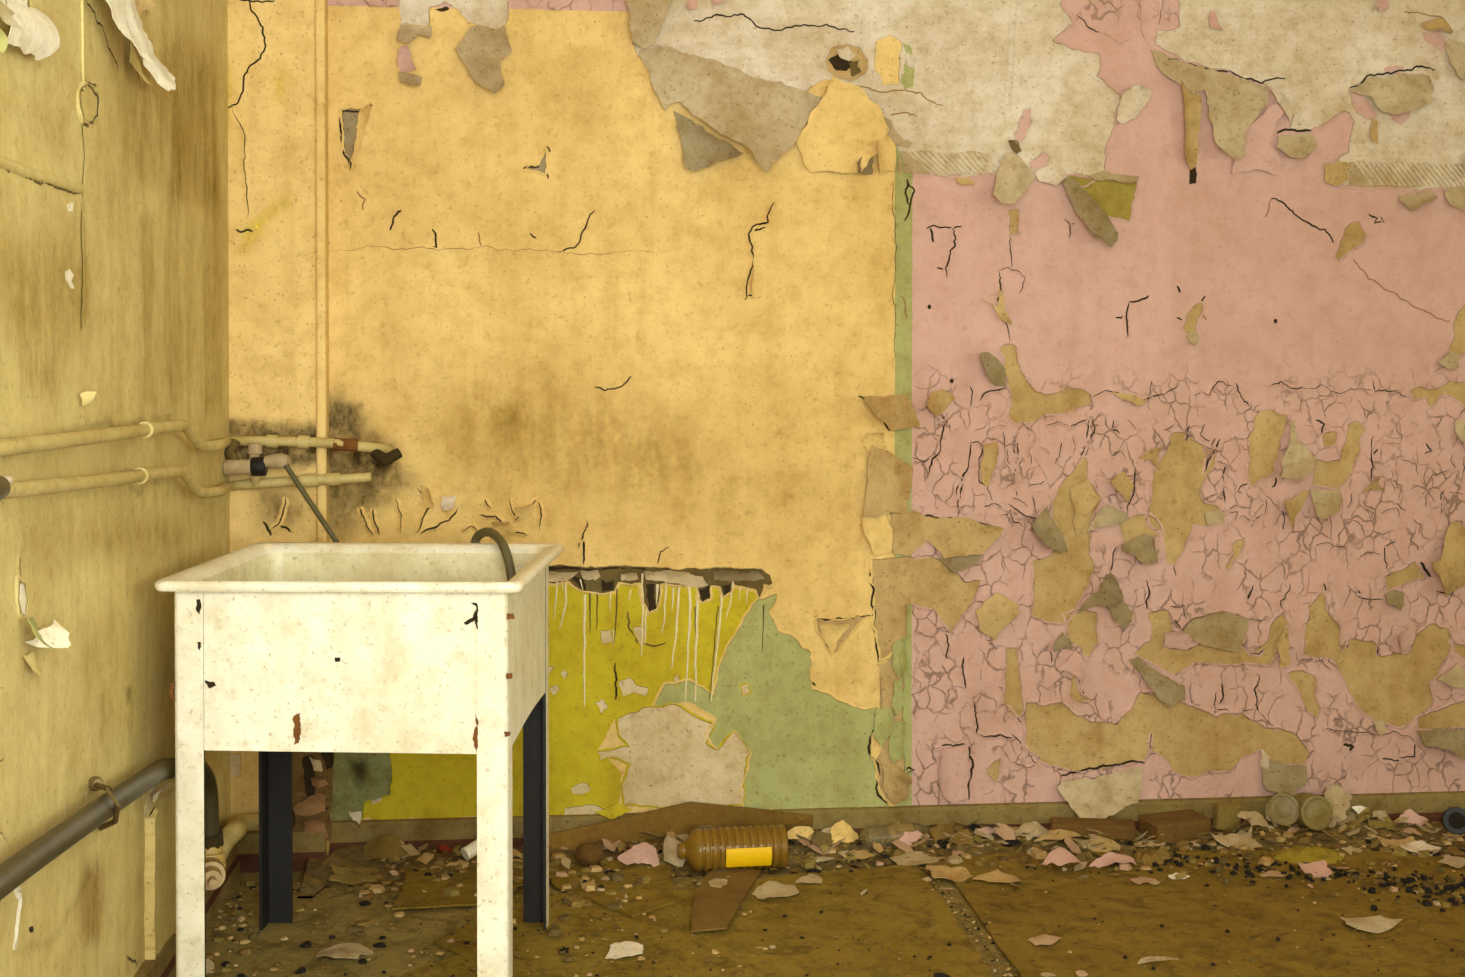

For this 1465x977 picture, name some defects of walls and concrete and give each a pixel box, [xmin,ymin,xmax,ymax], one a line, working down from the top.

peeling [0,0,60,60]
peeling [86,0,176,91]
peeling [365,0,513,94]
peeling [528,152,546,173]
damp [229,409,386,518]
peeling [617,0,1465,868]
crack [911,377,1465,625]
flaking render [562,673,751,819]
crack [906,632,1024,776]
crack [1186,671,1282,732]
crack [1299,639,1427,762]